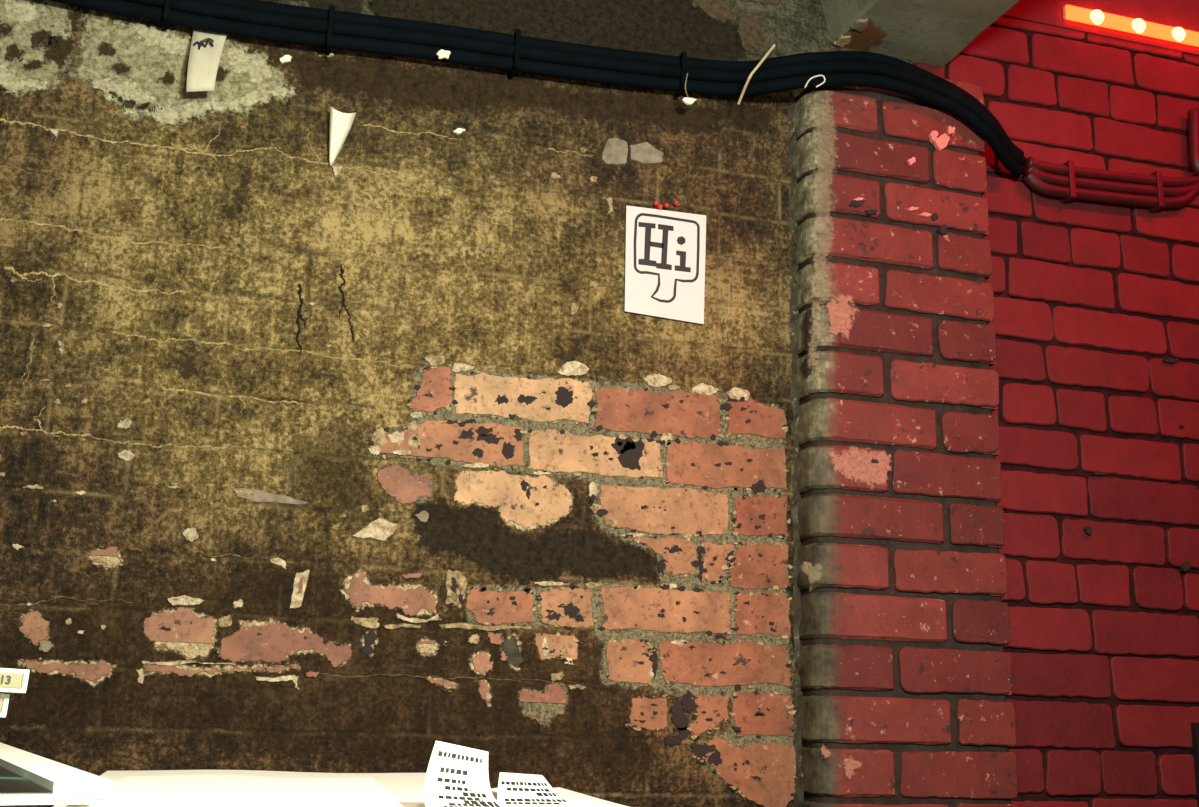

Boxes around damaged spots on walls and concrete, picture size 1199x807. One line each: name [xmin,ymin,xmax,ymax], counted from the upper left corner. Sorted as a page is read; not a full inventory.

leakage [261,0,748,61]
peeling [0,0,295,126]
crack [4,266,186,306]
crack [111,265,554,416]
peeling [41,379,88,405]
peeling [106,418,133,442]
peeling [118,450,137,461]
flaking render [86,546,123,571]
flaking render [136,355,797,807]
leakage [411,496,658,586]
flaking render [18,602,116,686]